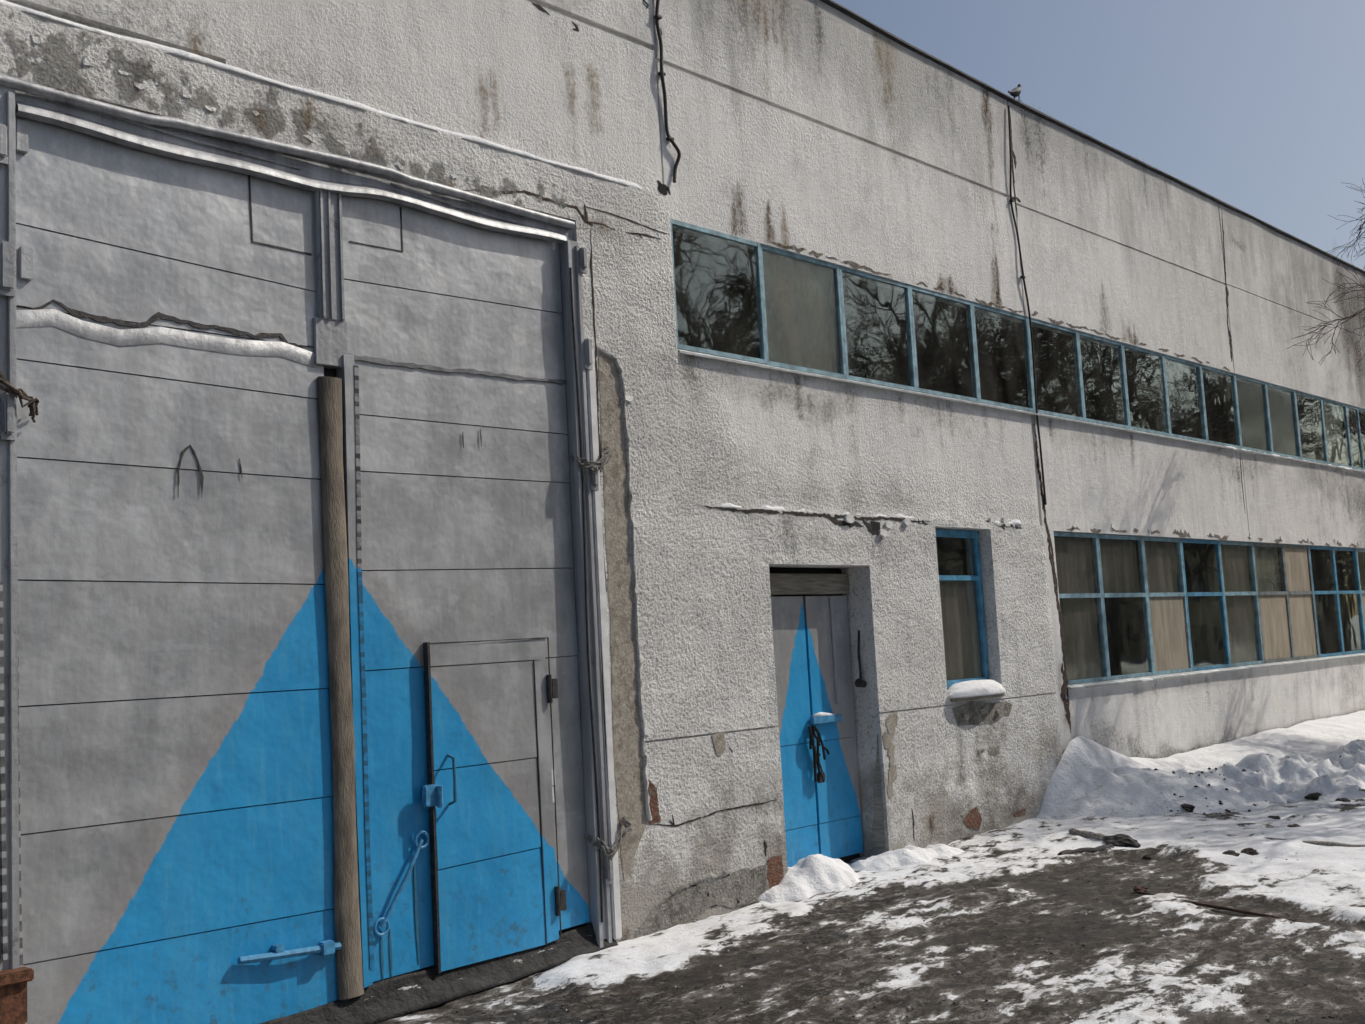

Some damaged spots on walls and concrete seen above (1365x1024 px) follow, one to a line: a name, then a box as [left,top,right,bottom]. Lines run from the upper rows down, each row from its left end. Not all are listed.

peeling [3,12,572,208]
crack [1010,114,1021,216]
crack [1222,219,1233,362]
flaking render [599,346,661,881]
crack [1034,416,1071,732]
spalling [952,701,1012,726]
flaking render [635,840,784,938]